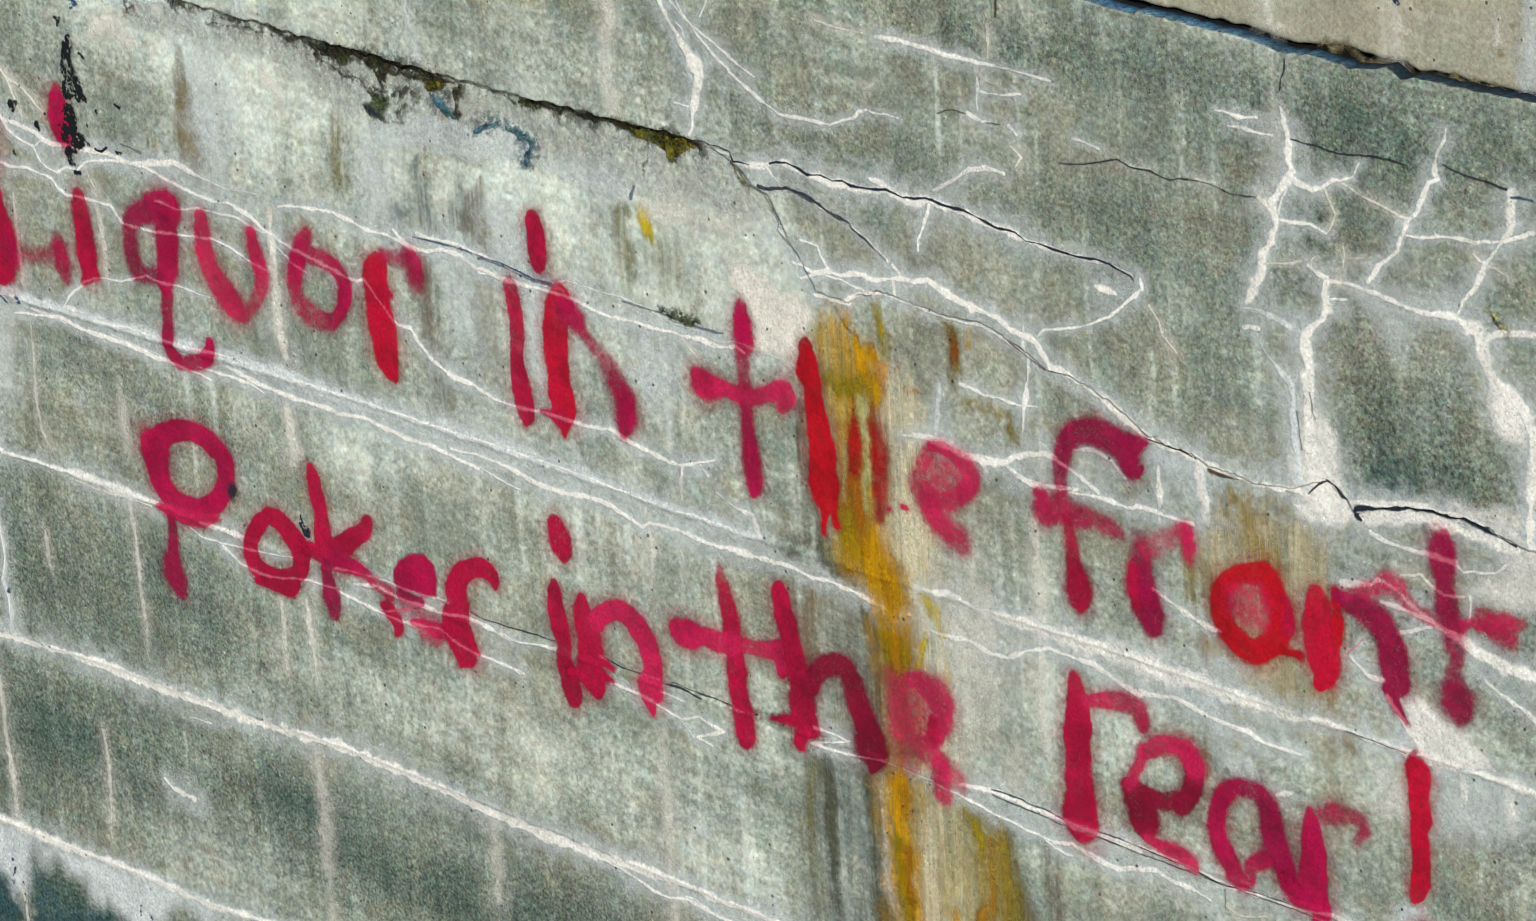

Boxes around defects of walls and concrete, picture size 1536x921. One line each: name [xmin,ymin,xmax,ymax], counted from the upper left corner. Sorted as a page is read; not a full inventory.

crack [0,68,735,358]
crack [14,276,1303,758]
corrosion [818,289,951,693]
corrosion [937,316,972,382]
corrosion [1007,422,1020,460]
crack [657,0,1536,725]
corrosion [886,737,1025,921]
crack [810,722,1313,918]